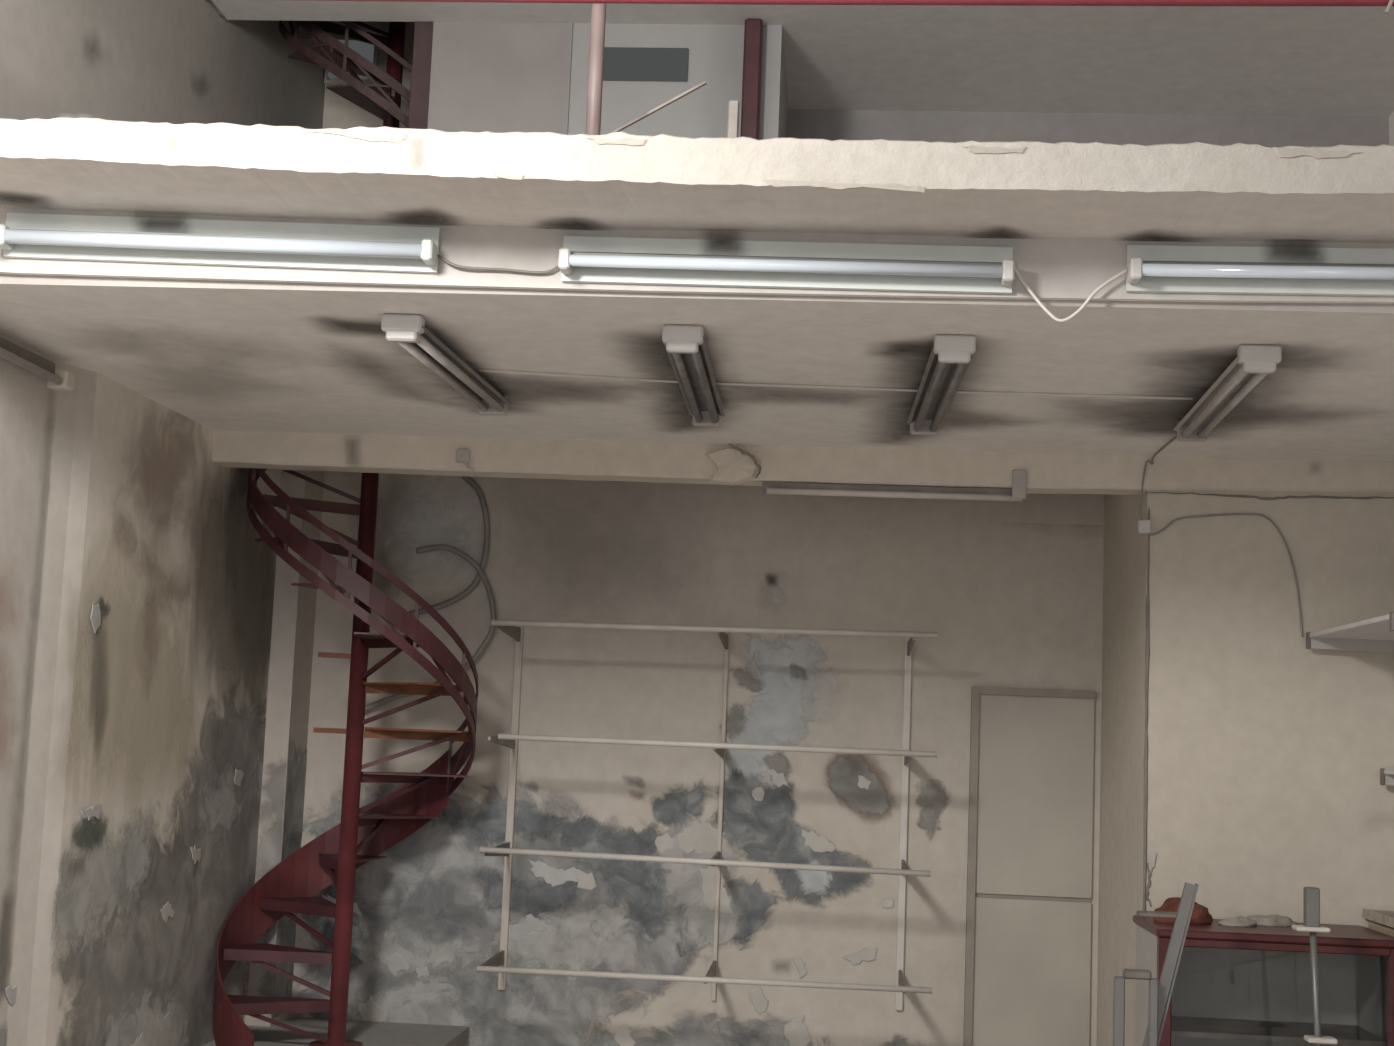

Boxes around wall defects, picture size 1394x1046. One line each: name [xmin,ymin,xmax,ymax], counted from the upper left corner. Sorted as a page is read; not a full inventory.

crack [728,444,762,478]
leakage [96,626,104,736]
spalling [628,636,870,956]
spalling [828,754,891,817]
spalling [917,781,947,833]
peeling [347,859,652,1046]
peeling [105,984,190,1046]